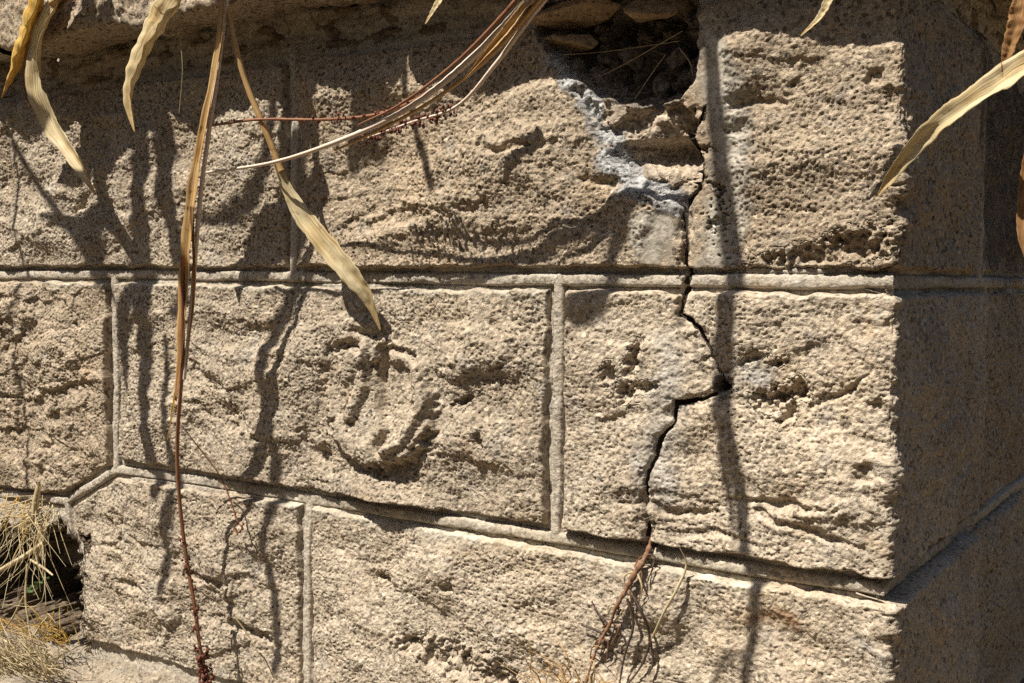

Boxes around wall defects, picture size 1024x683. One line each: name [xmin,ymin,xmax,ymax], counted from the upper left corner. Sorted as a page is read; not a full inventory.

damp [543,50,693,266]
spalling [534,0,705,209]
crack [645,106,732,545]